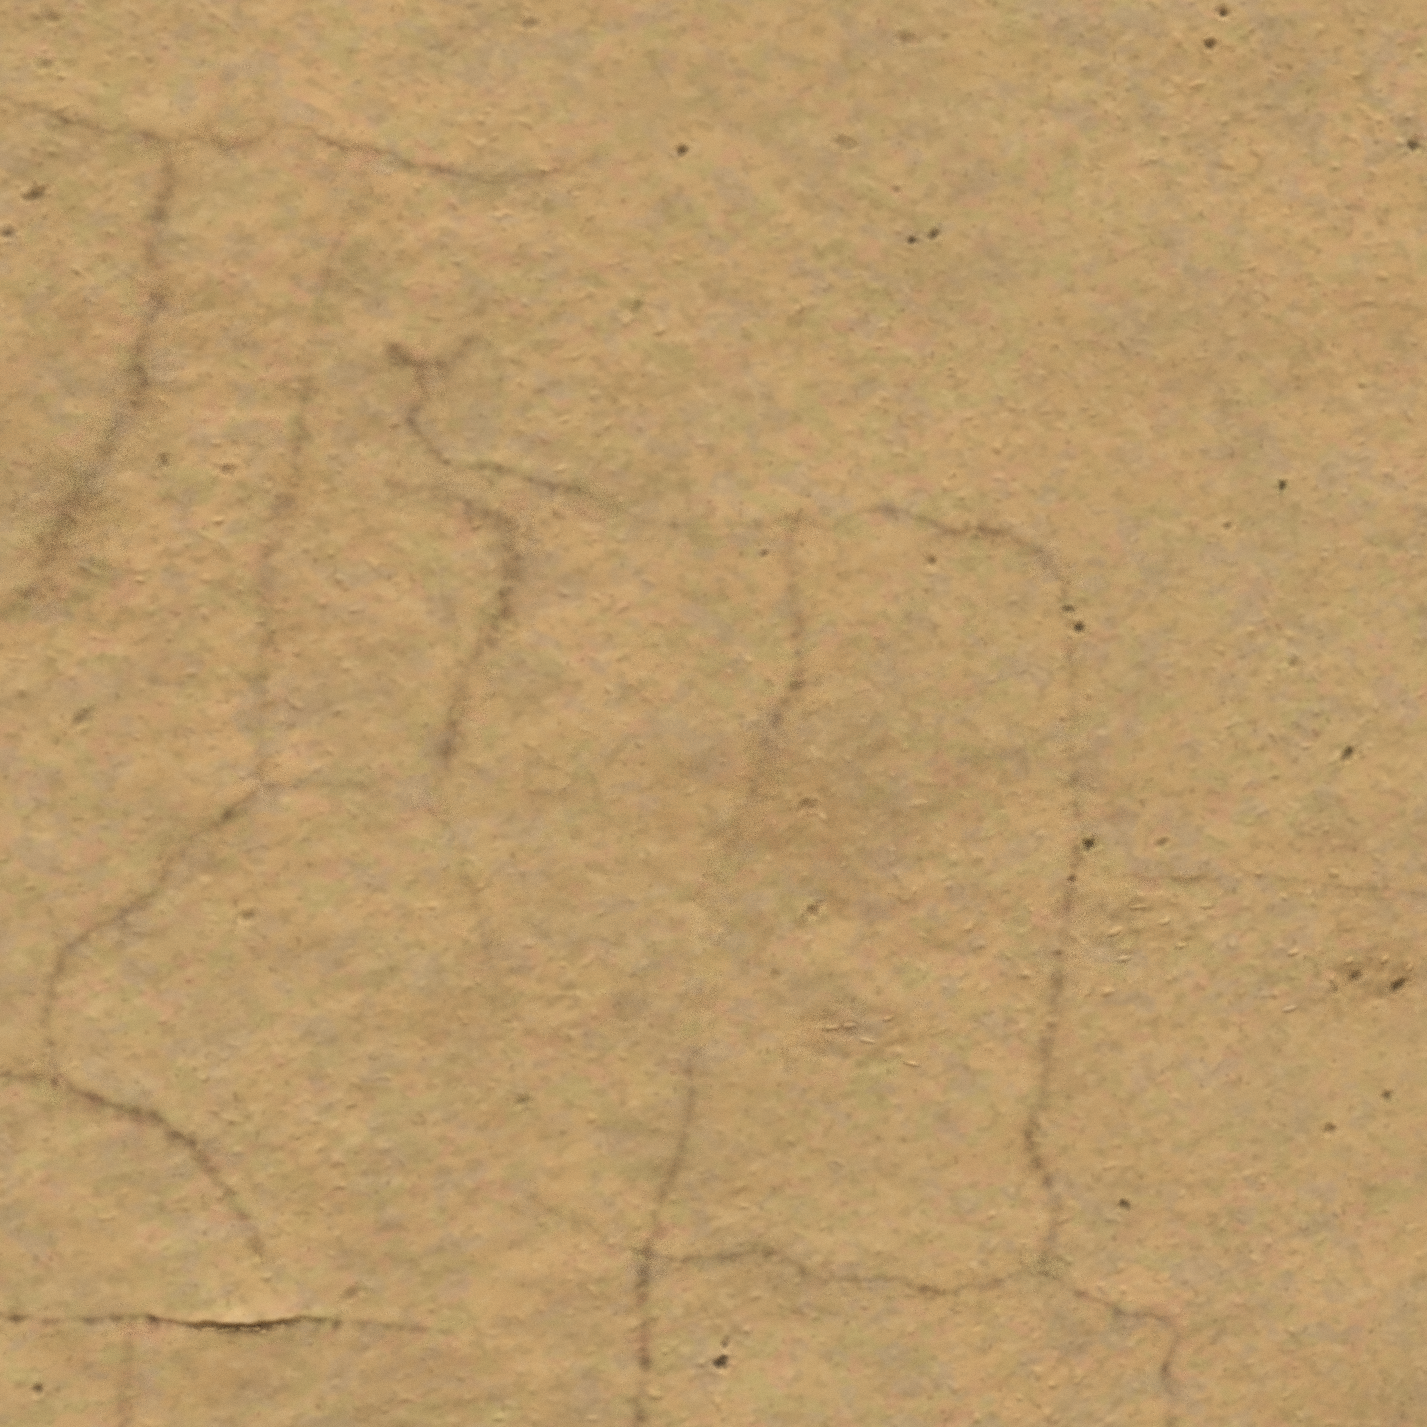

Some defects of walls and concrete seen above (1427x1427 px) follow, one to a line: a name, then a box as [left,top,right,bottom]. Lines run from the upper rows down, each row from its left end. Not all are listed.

crack [226,1323,270,1332]